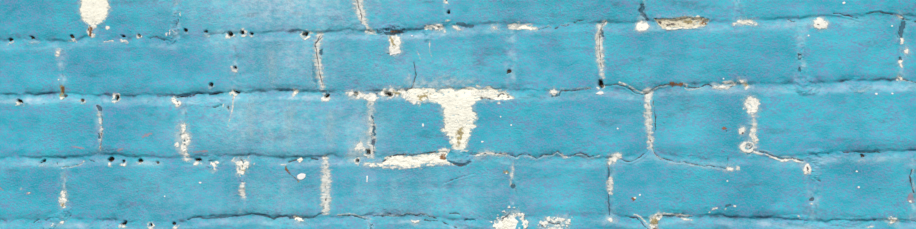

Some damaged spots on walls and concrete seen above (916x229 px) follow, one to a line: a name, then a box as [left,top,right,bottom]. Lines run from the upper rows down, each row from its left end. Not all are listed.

peeling [79,0,112,38]
spalling [635,4,709,33]
peeling [174,123,249,198]
peeling [346,79,514,170]
crack [472,20,726,169]
peeling [490,206,573,229]